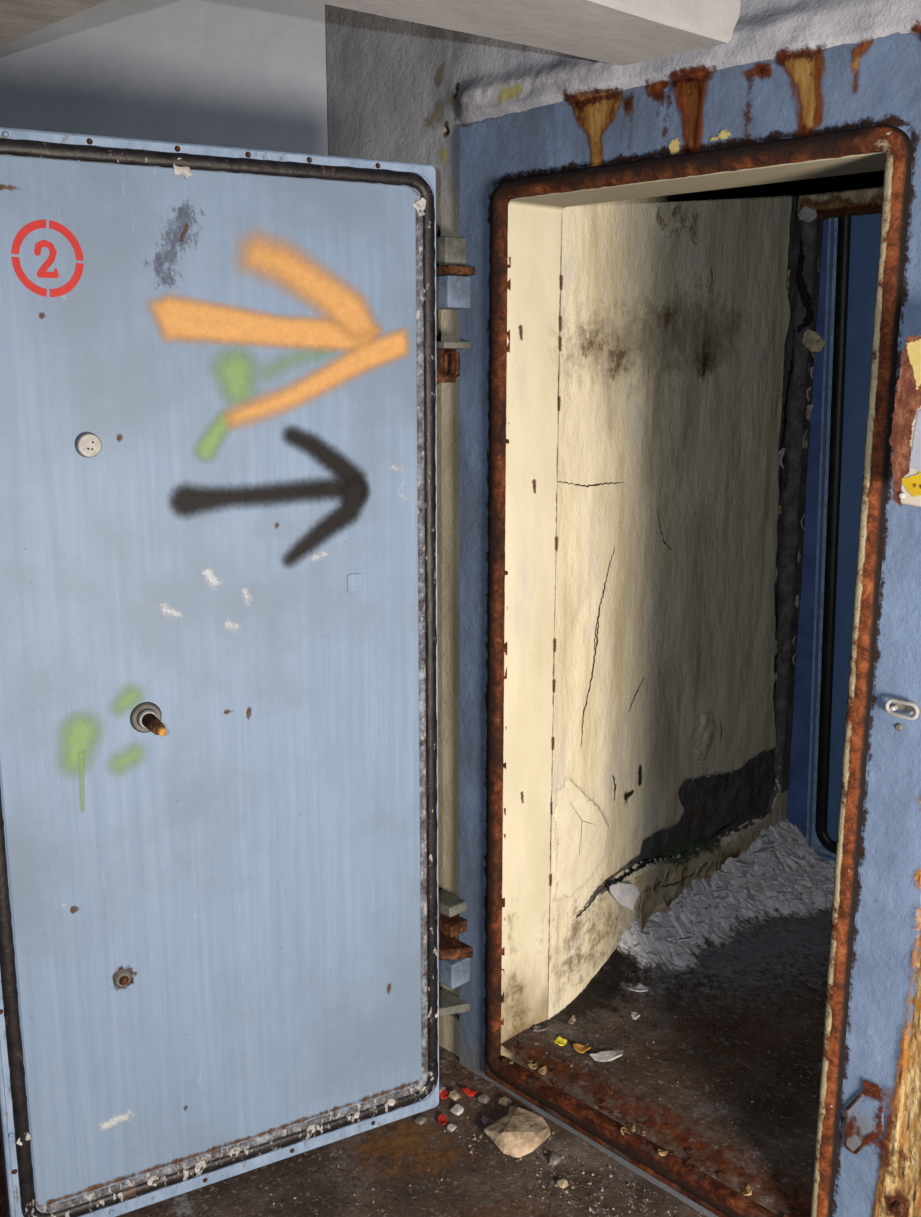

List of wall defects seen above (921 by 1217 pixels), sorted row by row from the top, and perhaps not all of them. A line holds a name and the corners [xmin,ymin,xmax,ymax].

water stain [582,330,626,371]
spalling [553,180,825,935]
corrosion [487,39,919,413]
corrosion [882,447,893,561]
corrosion [850,579,885,1000]
corrosion [501,1006,550,1081]
corrosion [620,1123,647,1136]
corrosion [832,909,921,1217]